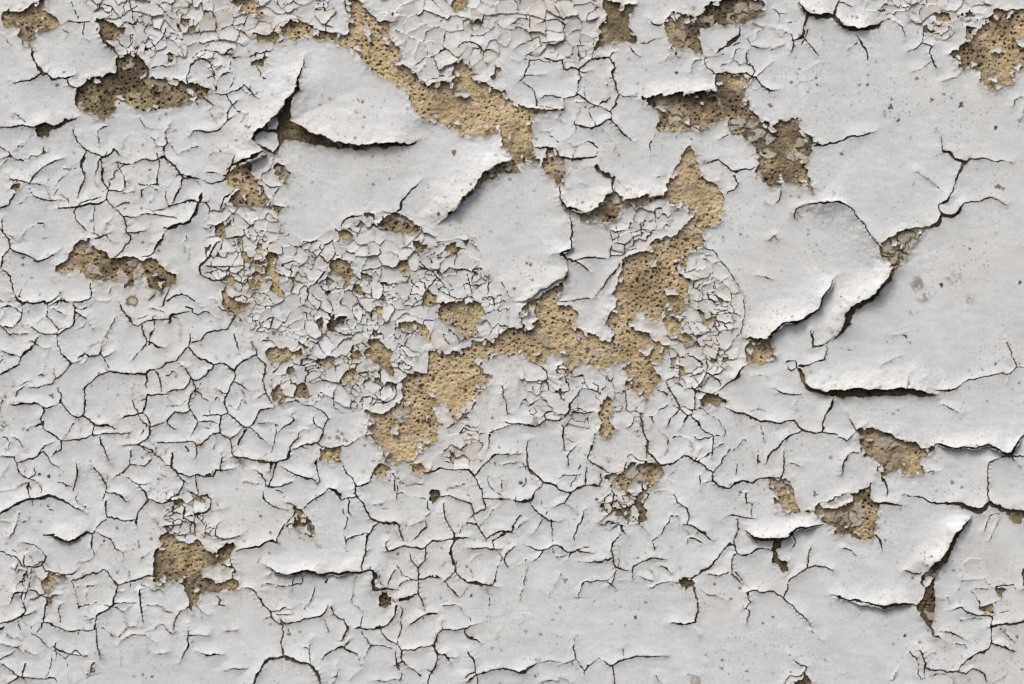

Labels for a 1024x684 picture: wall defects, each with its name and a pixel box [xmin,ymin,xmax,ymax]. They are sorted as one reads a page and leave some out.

peeling [55,238,177,294]
peeling [75,54,210,121]
crack [63,0,339,150]
peeling [210,0,727,481]
crack [379,0,996,302]
peeling [641,0,946,395]
crack [918,139,1012,229]
crack [0,115,899,684]
peeling [738,477,880,573]
peeling [857,414,1024,477]
crack [868,435,1024,575]
crack [894,568,1024,683]